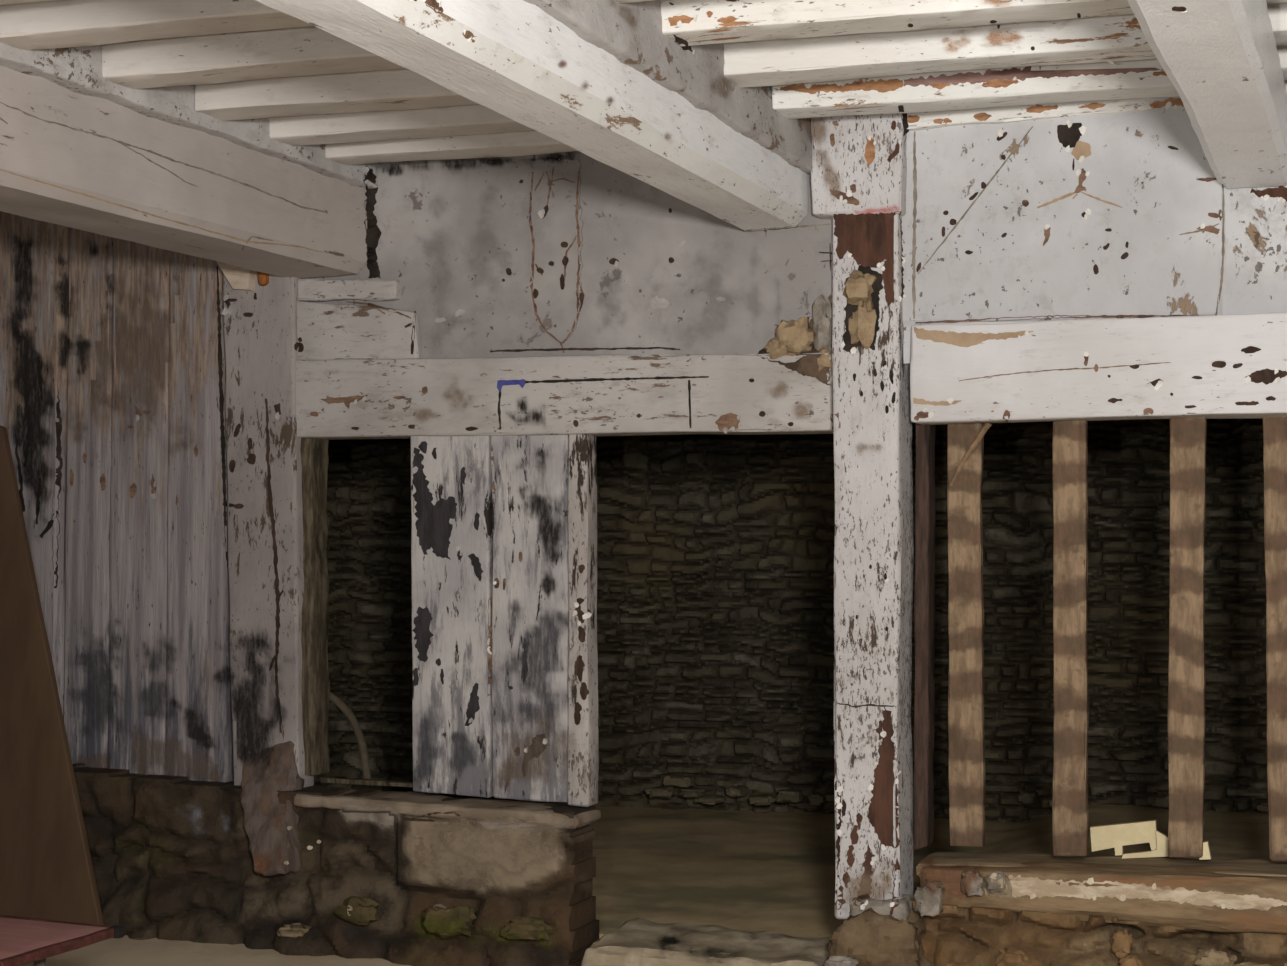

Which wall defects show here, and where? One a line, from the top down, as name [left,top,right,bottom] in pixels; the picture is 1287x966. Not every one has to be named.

peeling [775,46,1167,165]
spalling [1250,186,1287,203]
peeling [757,184,921,414]
leakage [11,237,175,503]
peeling [913,398,964,421]
peeling [1192,346,1287,406]
leakage [520,488,561,595]
leakage [133,642,218,782]
leakage [214,635,282,765]
leakage [450,733,473,772]
leakage [511,613,572,720]
peeling [835,710,902,915]